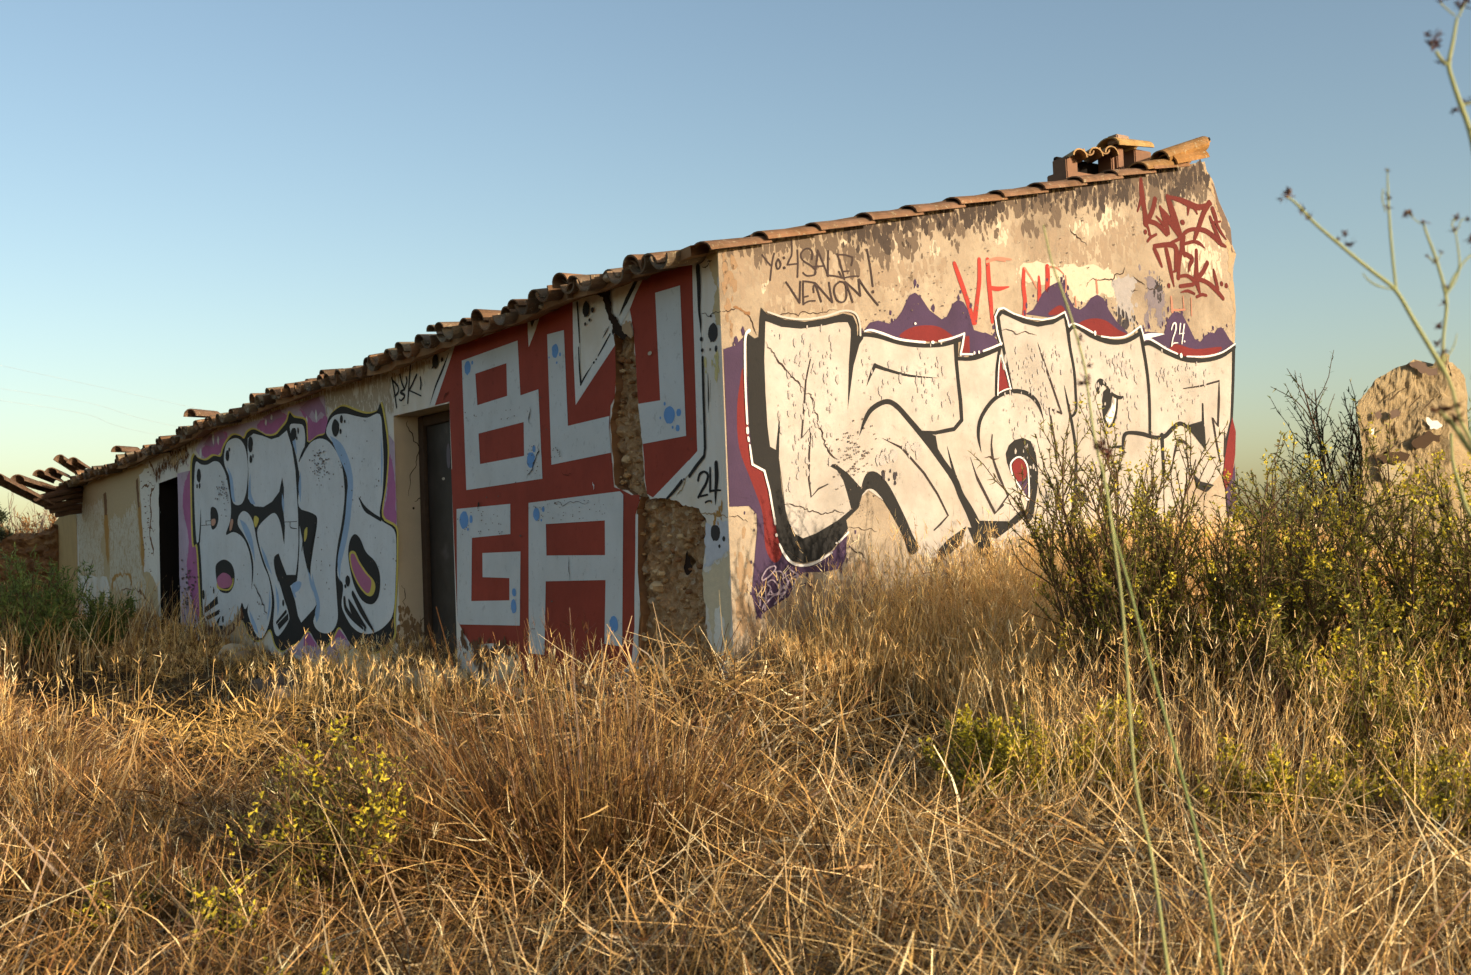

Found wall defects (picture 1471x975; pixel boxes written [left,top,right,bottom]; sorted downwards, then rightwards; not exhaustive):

crack [597,290,628,340]
flaking render [622,321,633,339]
leakage [721,159,1211,506]
peeling [684,517,733,659]